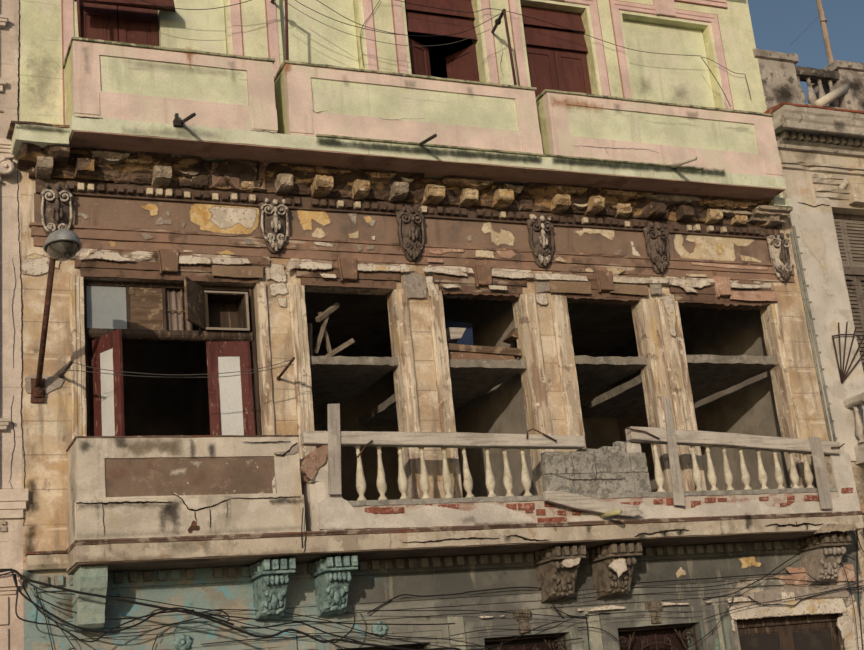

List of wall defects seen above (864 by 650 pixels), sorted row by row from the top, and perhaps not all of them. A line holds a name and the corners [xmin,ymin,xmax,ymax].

crack [15,1,23,121]
leakage [775,88,791,103]
peeling [297,210,333,247]
peeling [21,253,61,276]
peeling [179,250,336,307]
peeling [357,222,778,337]
crack [8,158,25,489]
leakage [161,503,177,523]
crack [76,492,301,535]
flaking render [506,502,581,523]
peeling [608,558,627,578]
peeling [738,556,761,569]